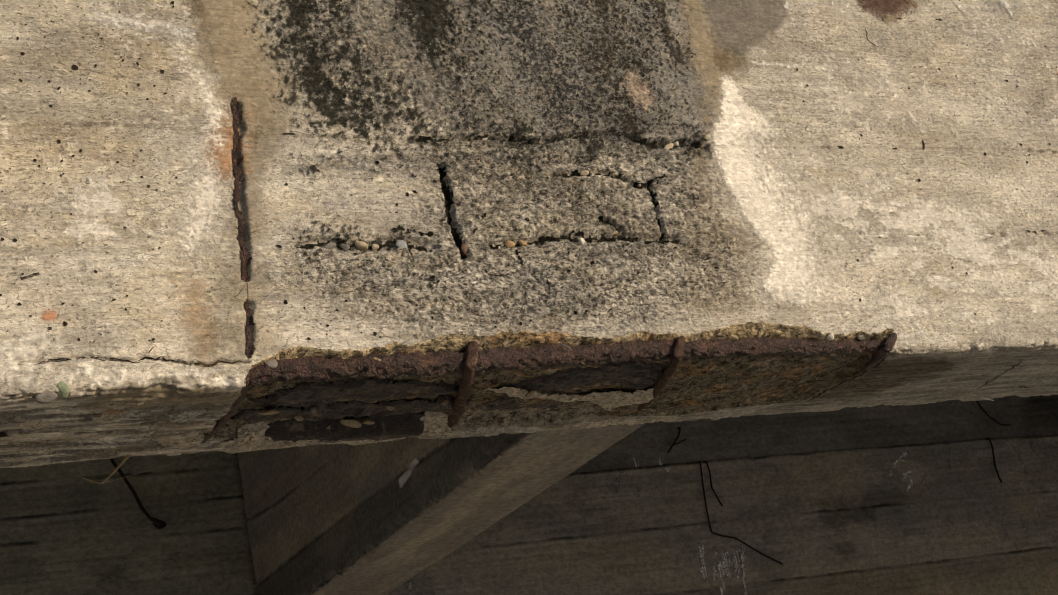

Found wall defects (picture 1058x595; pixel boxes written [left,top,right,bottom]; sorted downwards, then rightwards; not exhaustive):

corrosion [858,0,918,22]
water stain [36,167,129,241]
corrosion [206,105,255,181]
water stain [88,0,1058,341]
crack [18,346,247,367]
spalling [78,322,897,453]